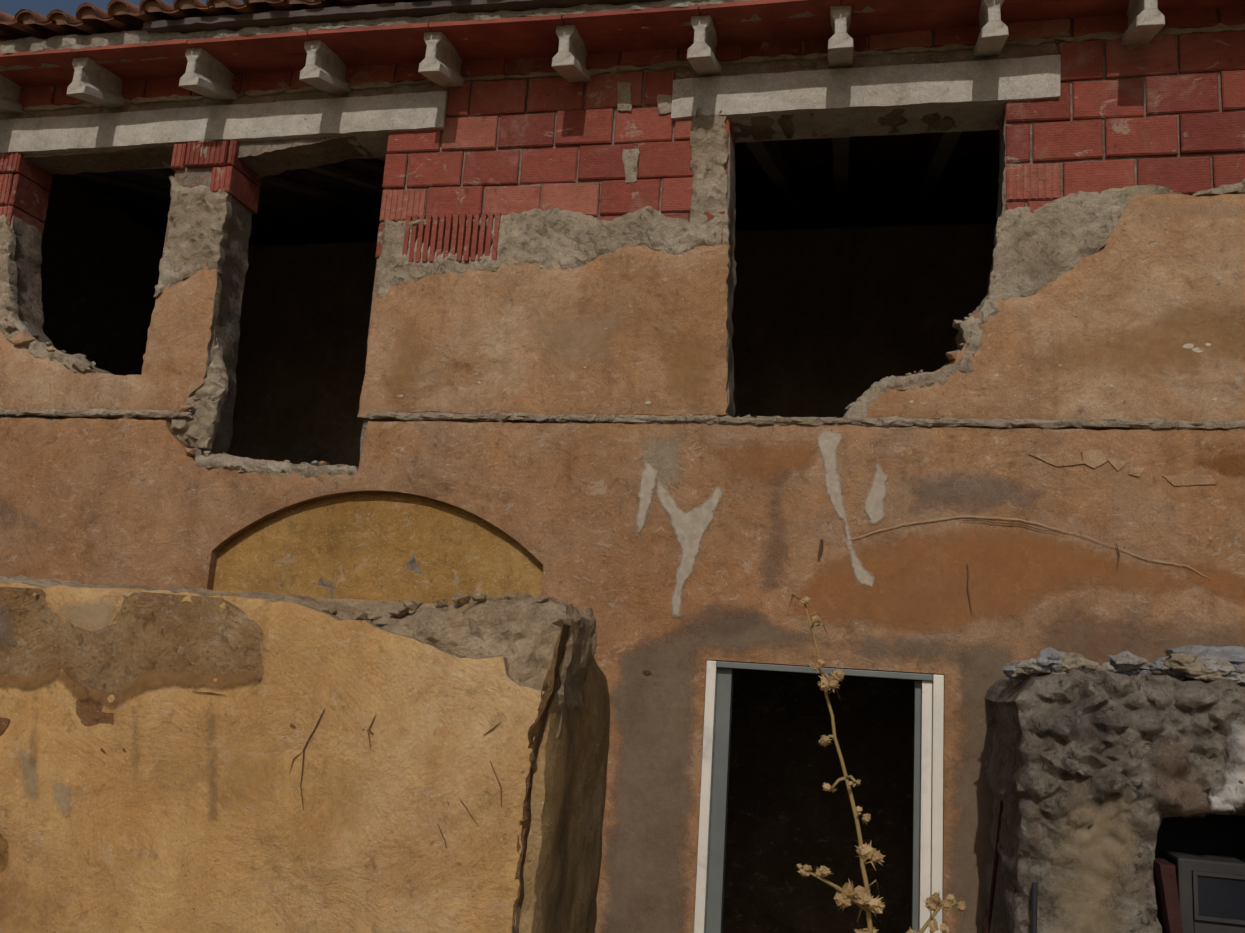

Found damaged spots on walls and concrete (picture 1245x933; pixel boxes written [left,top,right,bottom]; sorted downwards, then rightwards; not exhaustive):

spalling [843,288,1000,418]
flaking render [1183,343,1212,353]